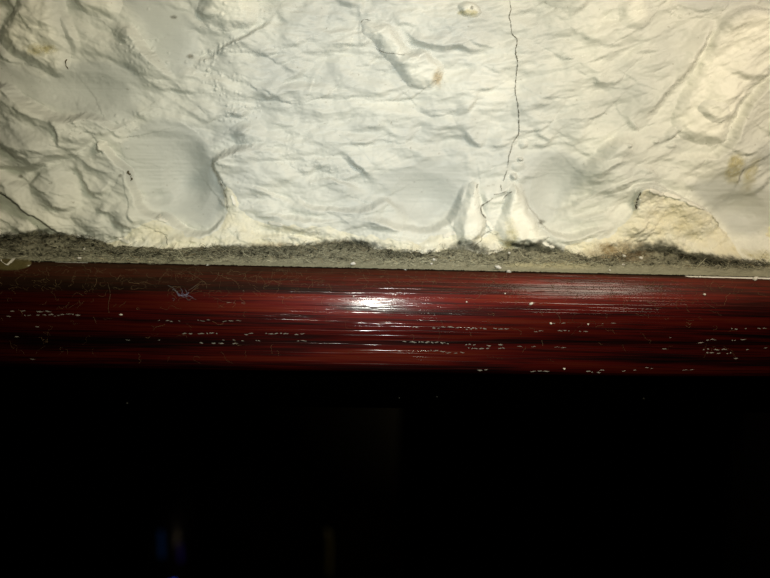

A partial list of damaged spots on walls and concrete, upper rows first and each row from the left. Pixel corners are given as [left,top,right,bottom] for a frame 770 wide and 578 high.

crack [475,4,520,247]
water stain [600,241,759,267]